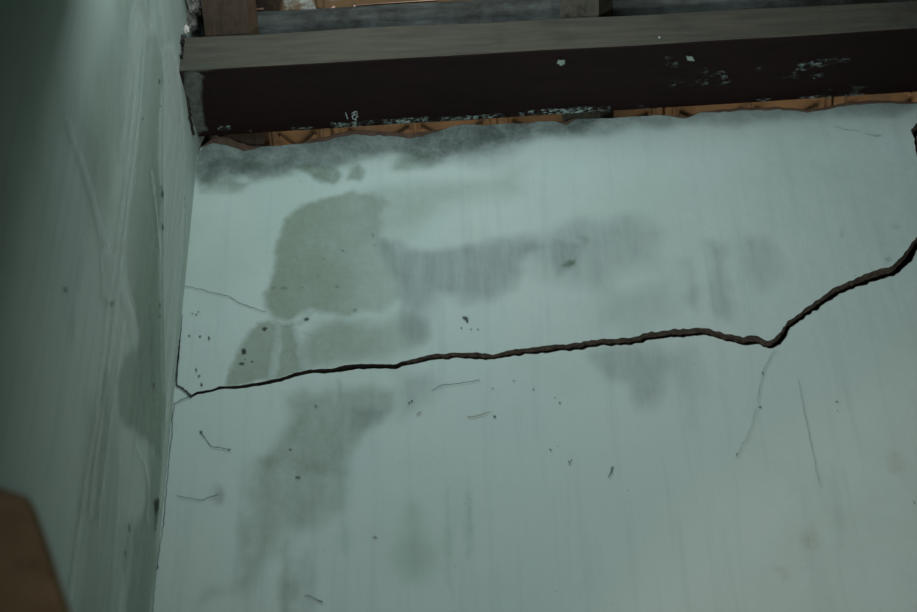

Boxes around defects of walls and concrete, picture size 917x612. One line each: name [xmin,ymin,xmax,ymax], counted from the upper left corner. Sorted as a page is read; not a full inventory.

crack [909,123,917,155]
crack [153,237,917,604]